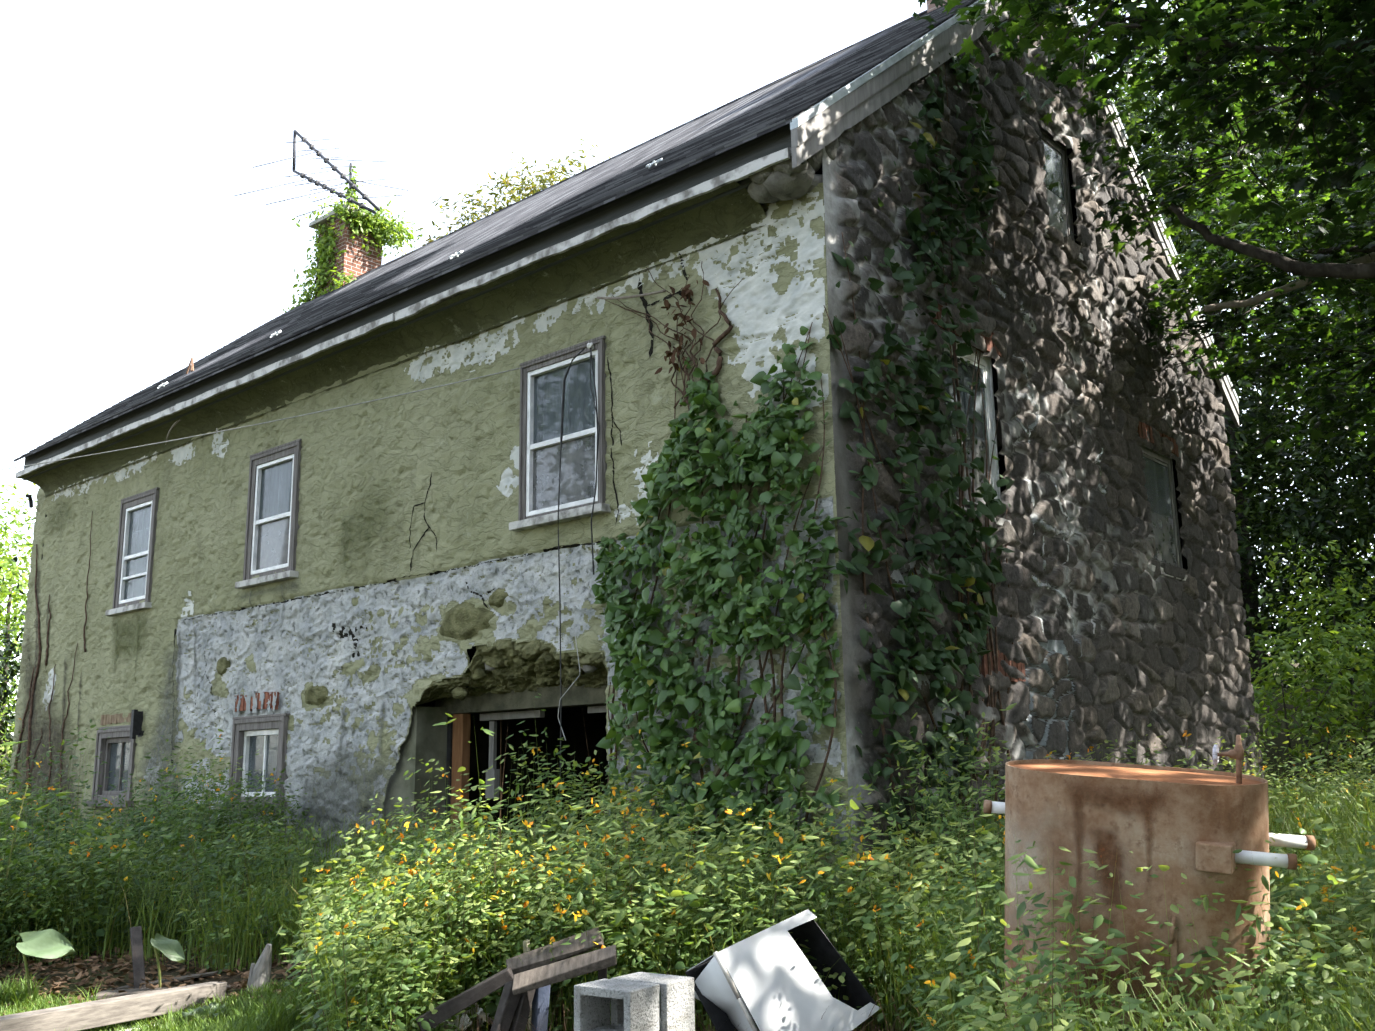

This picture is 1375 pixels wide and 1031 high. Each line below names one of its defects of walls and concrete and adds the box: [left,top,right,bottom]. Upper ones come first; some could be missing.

peeling [404,138,839,420]
crack [171,357,622,773]
peeling [144,441,847,877]